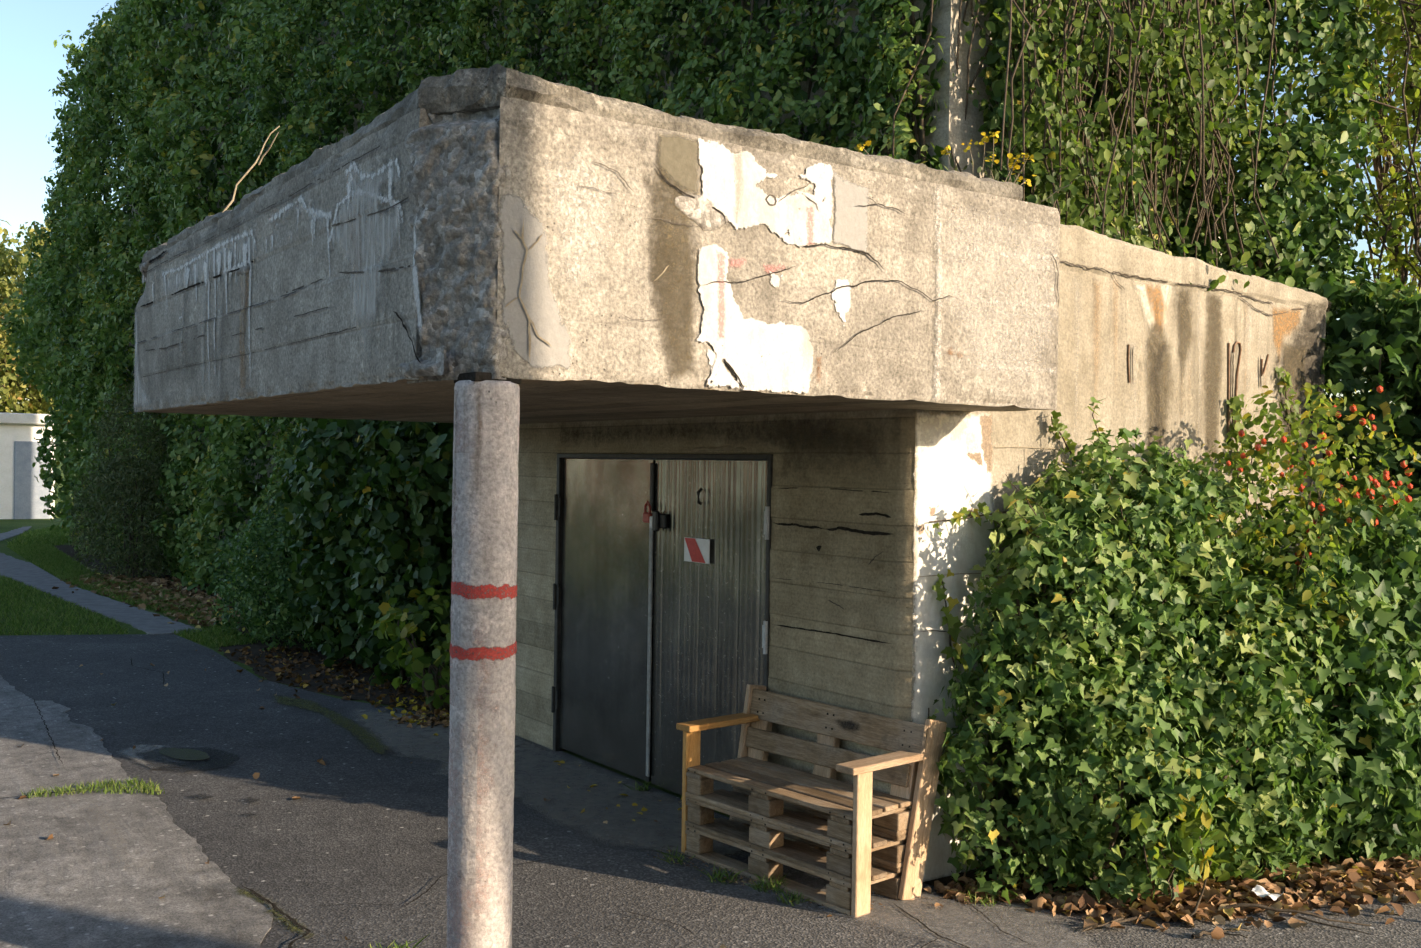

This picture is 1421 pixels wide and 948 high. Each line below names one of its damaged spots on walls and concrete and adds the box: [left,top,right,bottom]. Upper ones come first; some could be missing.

efflorescence [152,158,422,363]
leakage [651,166,693,373]
peeling [675,138,834,394]
crack [701,244,962,353]
peeling [832,279,851,327]
corrosion [1136,283,1169,336]
corrosion [1273,309,1300,353]